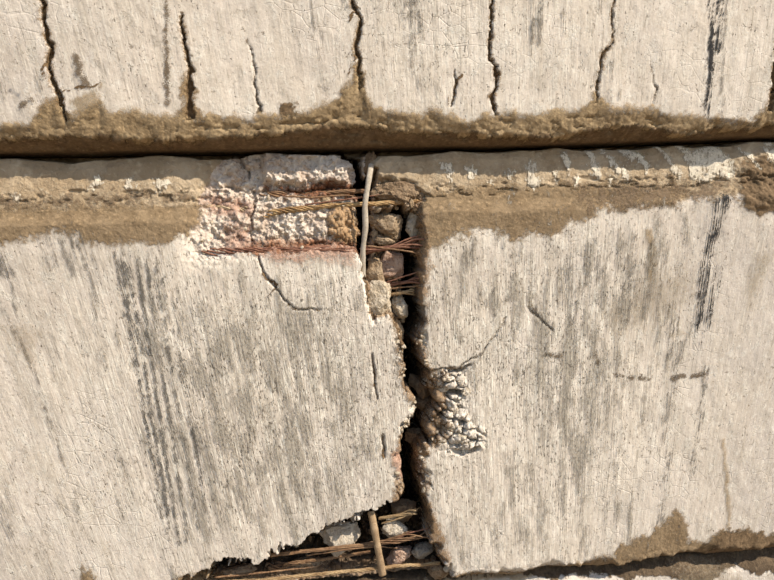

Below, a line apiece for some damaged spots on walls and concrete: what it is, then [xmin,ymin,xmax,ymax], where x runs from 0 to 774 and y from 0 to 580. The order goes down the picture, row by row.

crack [37,0,99,109]
crack [179,12,197,120]
crack [348,0,364,88]
leakage [0,0,774,157]
crack [486,0,501,117]
leakage [0,186,202,318]
rust [205,178,360,266]
leakage [120,259,206,546]
spalling [109,149,684,580]
crack [340,154,505,506]
leakage [417,155,774,490]
leakage [300,503,774,580]